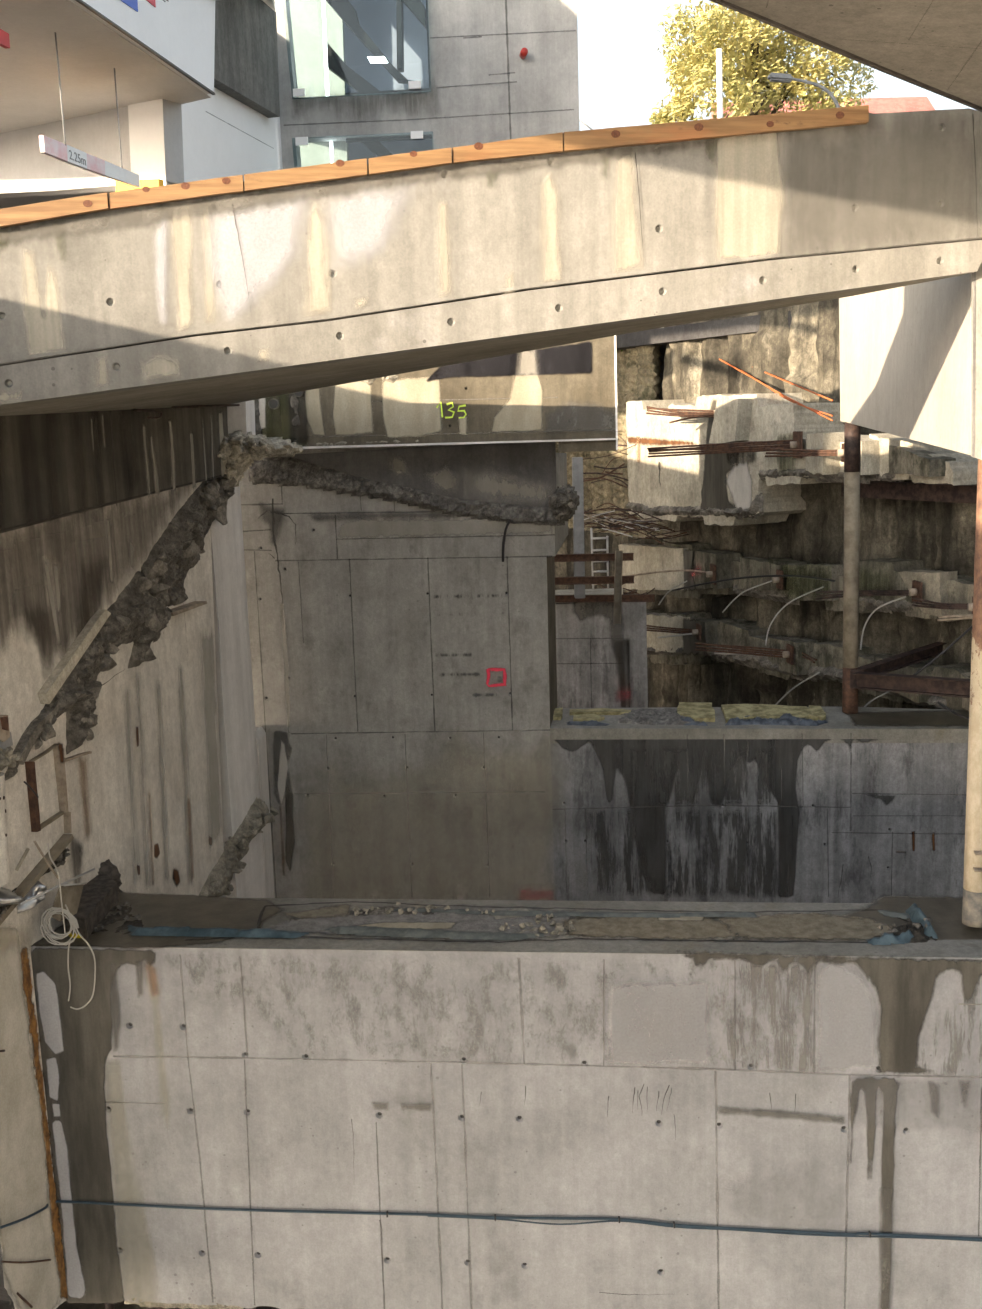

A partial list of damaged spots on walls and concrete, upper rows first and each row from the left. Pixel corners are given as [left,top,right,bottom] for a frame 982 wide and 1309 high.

spalling [860,473,904,484]
spalling [0,395,844,798]
damp [31,681,282,1304]
damp [203,638,219,838]
spalling [199,797,279,897]
damp [556,710,969,897]
damp [840,895,982,940]
damp [685,936,982,1309]